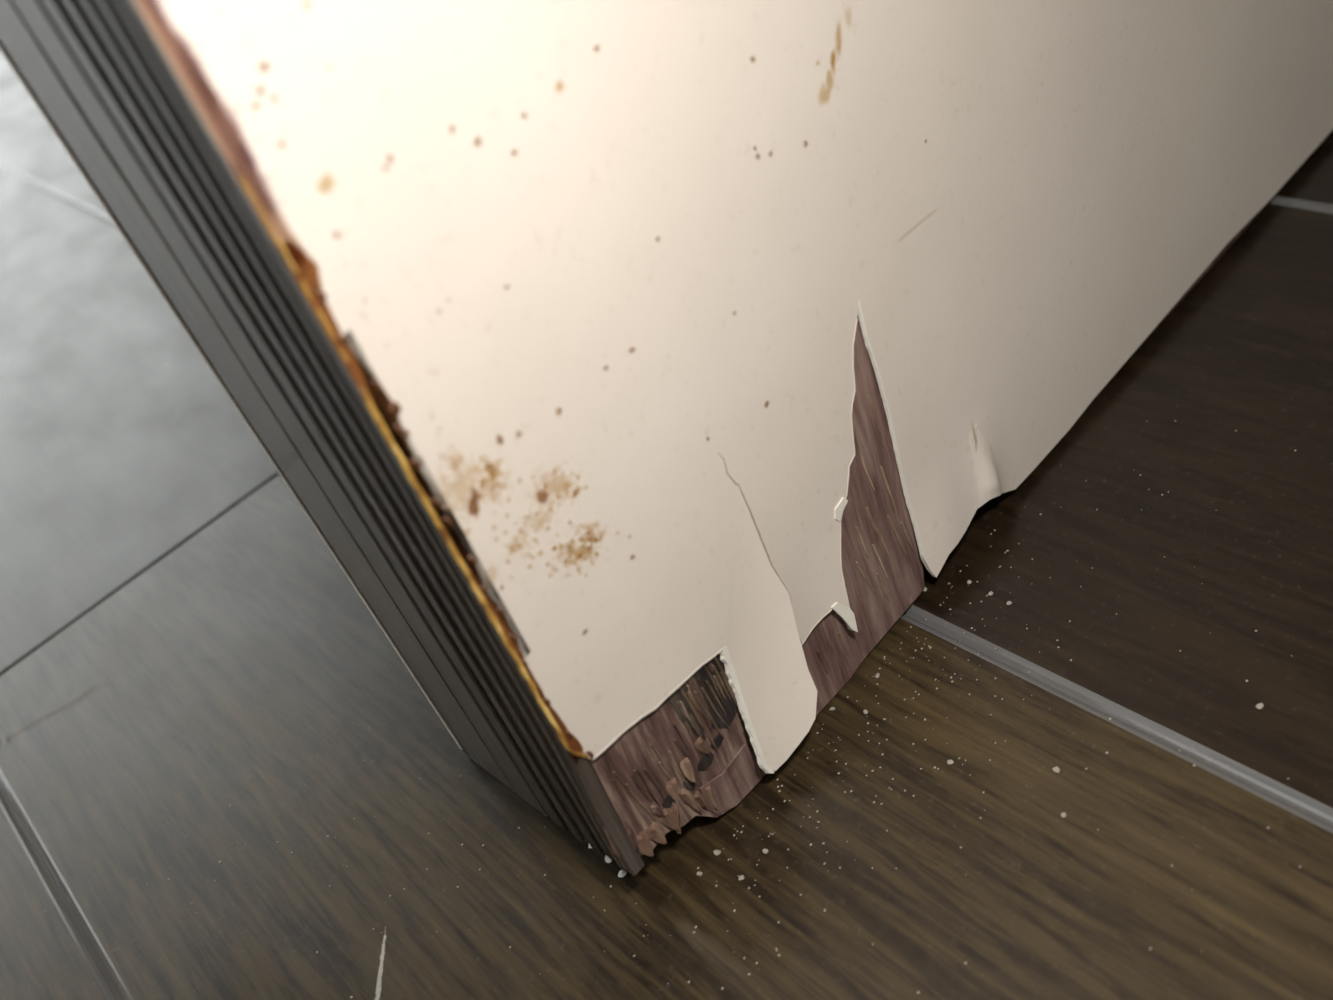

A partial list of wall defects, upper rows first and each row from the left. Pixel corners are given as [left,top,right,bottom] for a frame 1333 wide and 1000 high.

crack [718,453,791,600]
peeling [834,497,848,522]
peeling [831,602,858,632]
peeling [636,734,762,856]